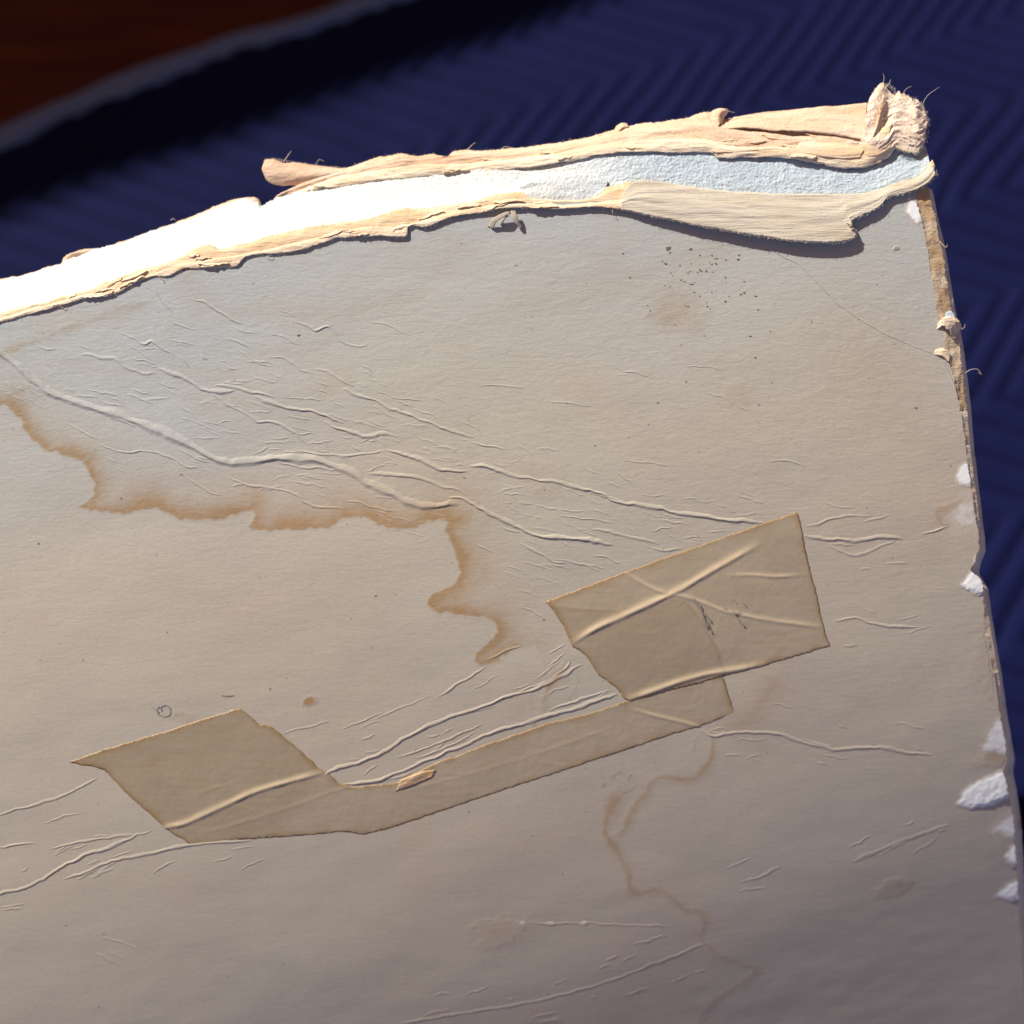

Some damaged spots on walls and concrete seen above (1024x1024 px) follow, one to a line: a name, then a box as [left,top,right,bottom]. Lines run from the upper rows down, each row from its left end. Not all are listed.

peeling [262,159,349,188]
peeling [457,198,559,212]
spalling [903,196,922,226]
peeling [320,229,369,238]
peeling [189,253,229,267]
peeling [51,276,144,307]
leakage [0,278,601,734]
spalling [945,461,984,597]
spalling [954,714,1019,904]
leakage [579,650,823,1024]